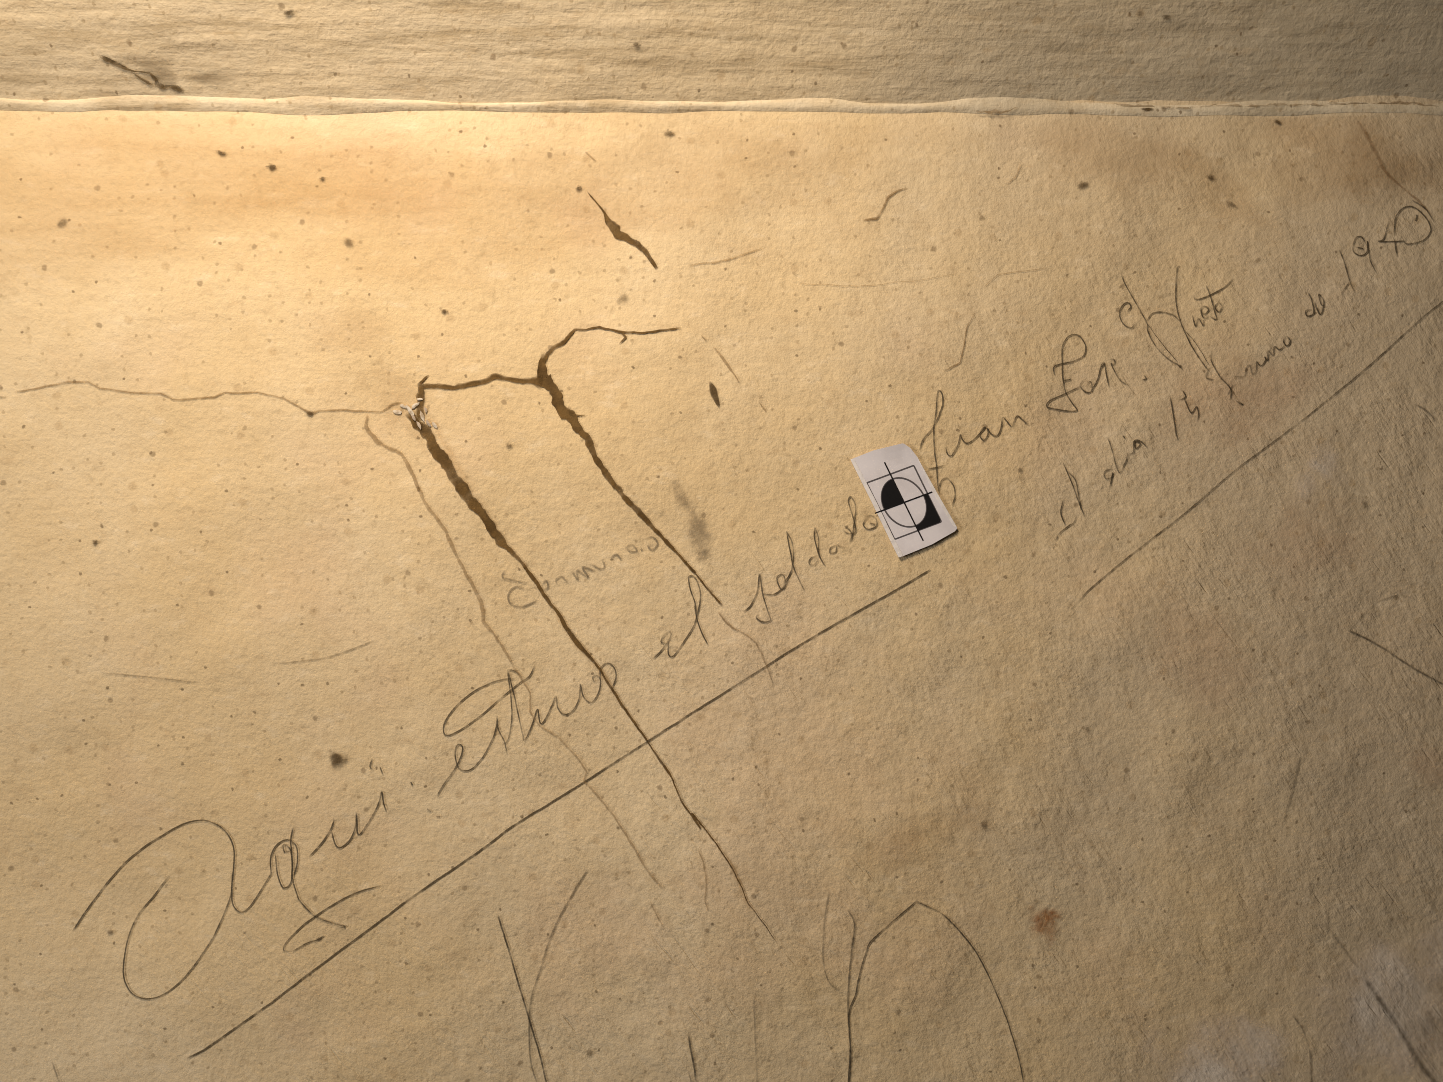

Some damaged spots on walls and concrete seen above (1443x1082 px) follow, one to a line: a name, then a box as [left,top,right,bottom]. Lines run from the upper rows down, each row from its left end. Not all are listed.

crack [588,193,657,268]
crack [22,326,775,939]